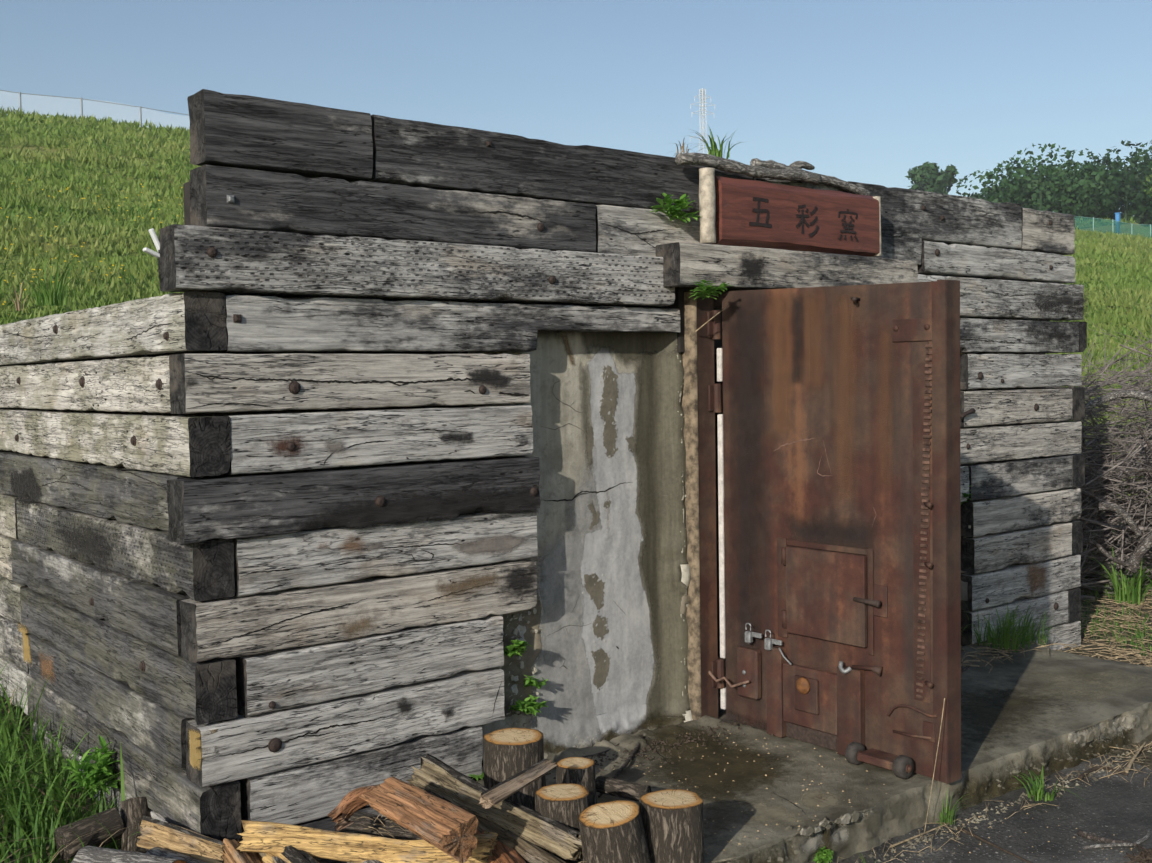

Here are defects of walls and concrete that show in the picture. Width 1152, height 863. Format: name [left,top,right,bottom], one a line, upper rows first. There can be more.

damp [467,369,511,388]
peeling [585,364,636,465]
crack [544,482,630,502]
damp [453,535,526,554]
peeling [582,573,611,695]
damp [500,331,838,839]